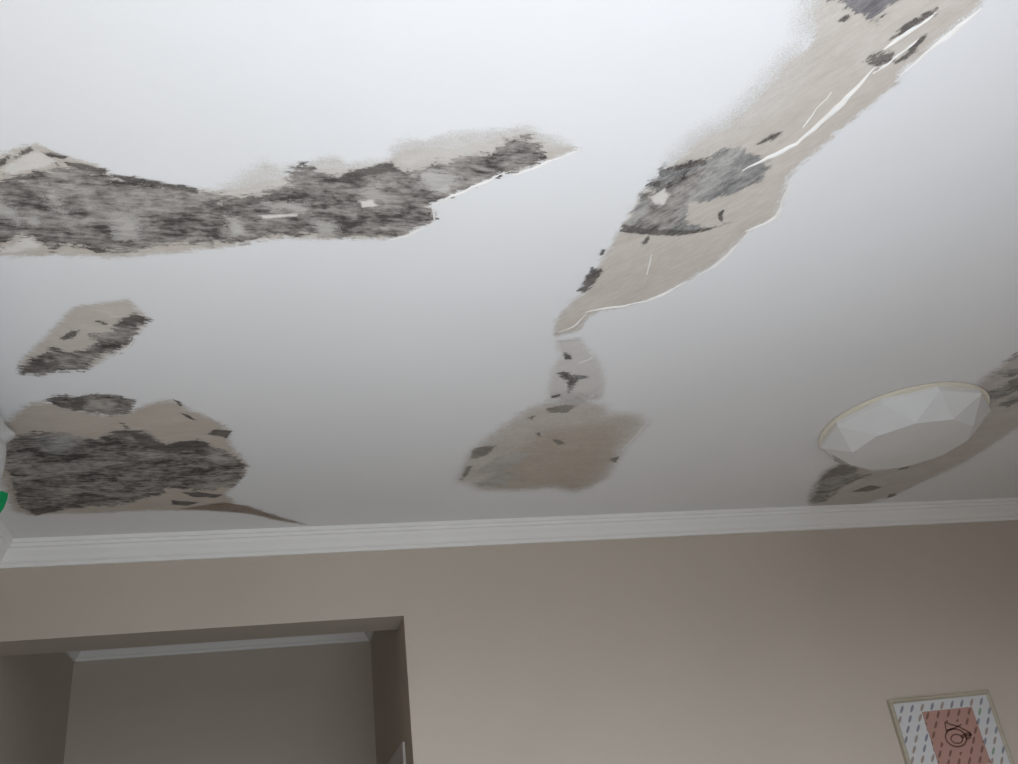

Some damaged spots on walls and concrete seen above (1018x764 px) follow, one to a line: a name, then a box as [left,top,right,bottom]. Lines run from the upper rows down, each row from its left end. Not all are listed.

peeling [0,120,580,261]
peeling [545,0,984,403]
peeling [15,297,155,378]
peeling [0,392,306,525]
peeling [805,352,1018,506]